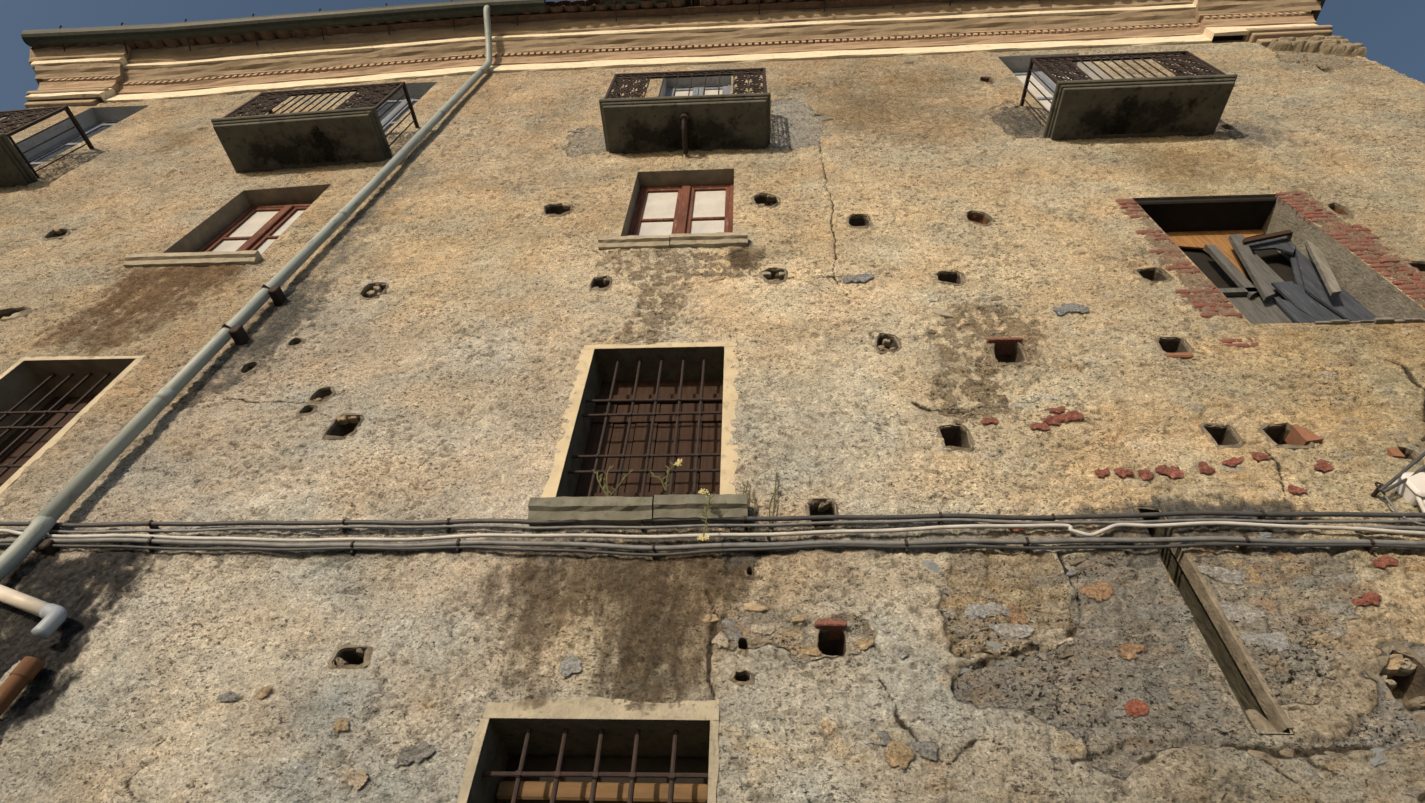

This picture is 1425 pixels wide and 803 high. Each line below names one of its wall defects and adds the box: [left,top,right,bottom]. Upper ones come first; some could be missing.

crack [672,142,890,285]
flaking render [1115,199,1243,318]
flaking render [1275,190,1425,308]
crack [1393,362,1425,442]
damp [0,543,153,729]
flaking render [921,532,1425,779]